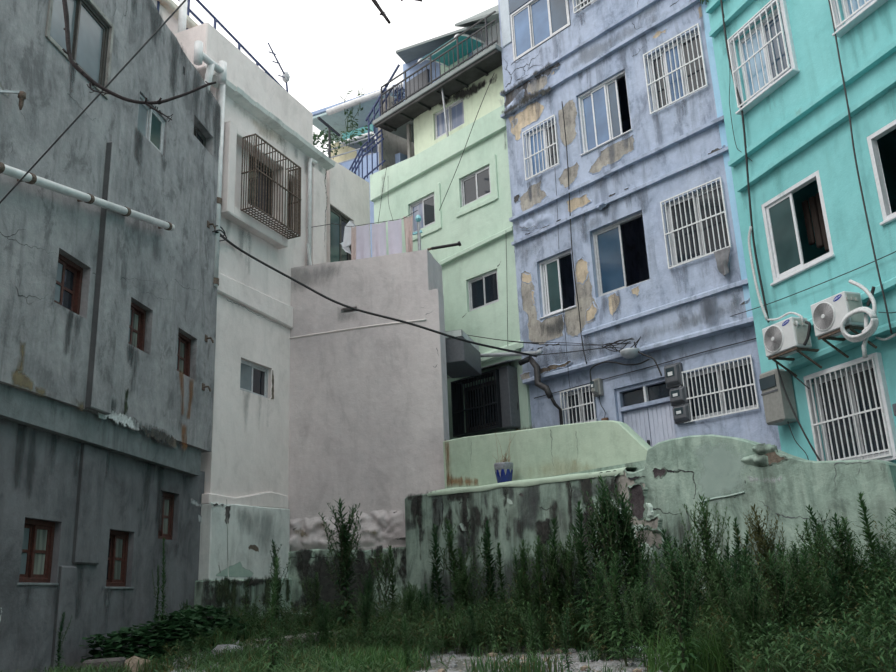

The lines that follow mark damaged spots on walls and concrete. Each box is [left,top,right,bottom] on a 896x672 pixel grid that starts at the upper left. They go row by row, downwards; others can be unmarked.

leakage [149,3,162,40]
leakage [171,37,186,93]
leakage [193,71,221,146]
crack [503,51,540,87]
peeling [504,62,562,141]
peeling [541,134,635,228]
leakage [65,312,78,351]
peeling [520,256,621,350]
spalling [741,443,789,467]
leakage [407,476,620,616]
spalling [610,466,680,560]
crack [653,470,696,524]